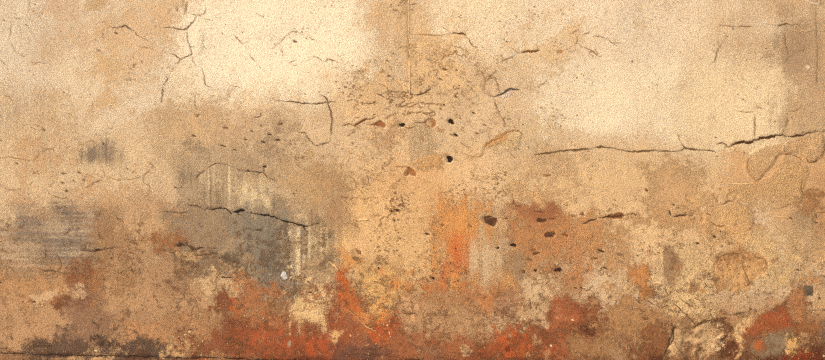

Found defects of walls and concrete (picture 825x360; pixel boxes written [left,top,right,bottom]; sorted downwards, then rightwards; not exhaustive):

crack [161,10,236,111]
crack [234,22,341,68]
crack [258,26,550,157]
crack [161,144,320,230]
crack [338,157,408,229]
crack [583,213,637,224]
crack [534,107,825,207]
crack [669,188,754,231]
crack [154,243,500,342]
rust [0,183,671,360]
crack [555,266,752,360]
rust [711,276,825,360]